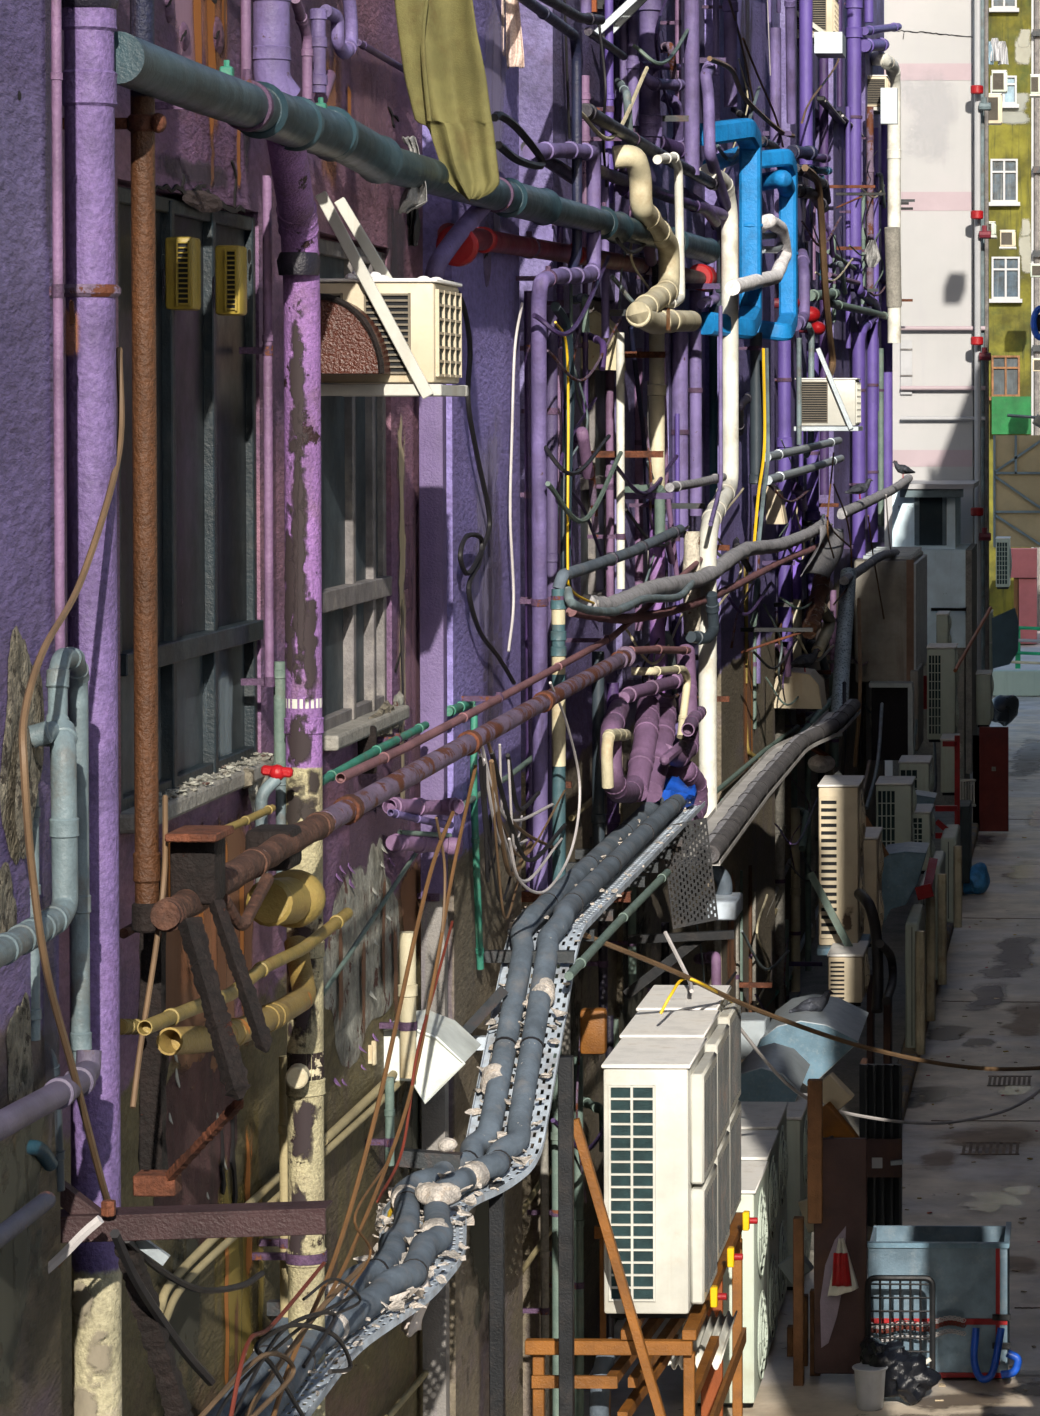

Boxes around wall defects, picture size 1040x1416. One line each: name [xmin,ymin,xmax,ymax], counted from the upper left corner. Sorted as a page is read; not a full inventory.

rust [193,0,227,70]
peeling [284,299,320,824]
spalling [0,625,44,933]
spalling [287,838,400,1087]
spalling [6,992,34,1104]
peeling [292,1100,317,1161]
peeling [289,1235,306,1255]
peeling [291,1184,307,1202]